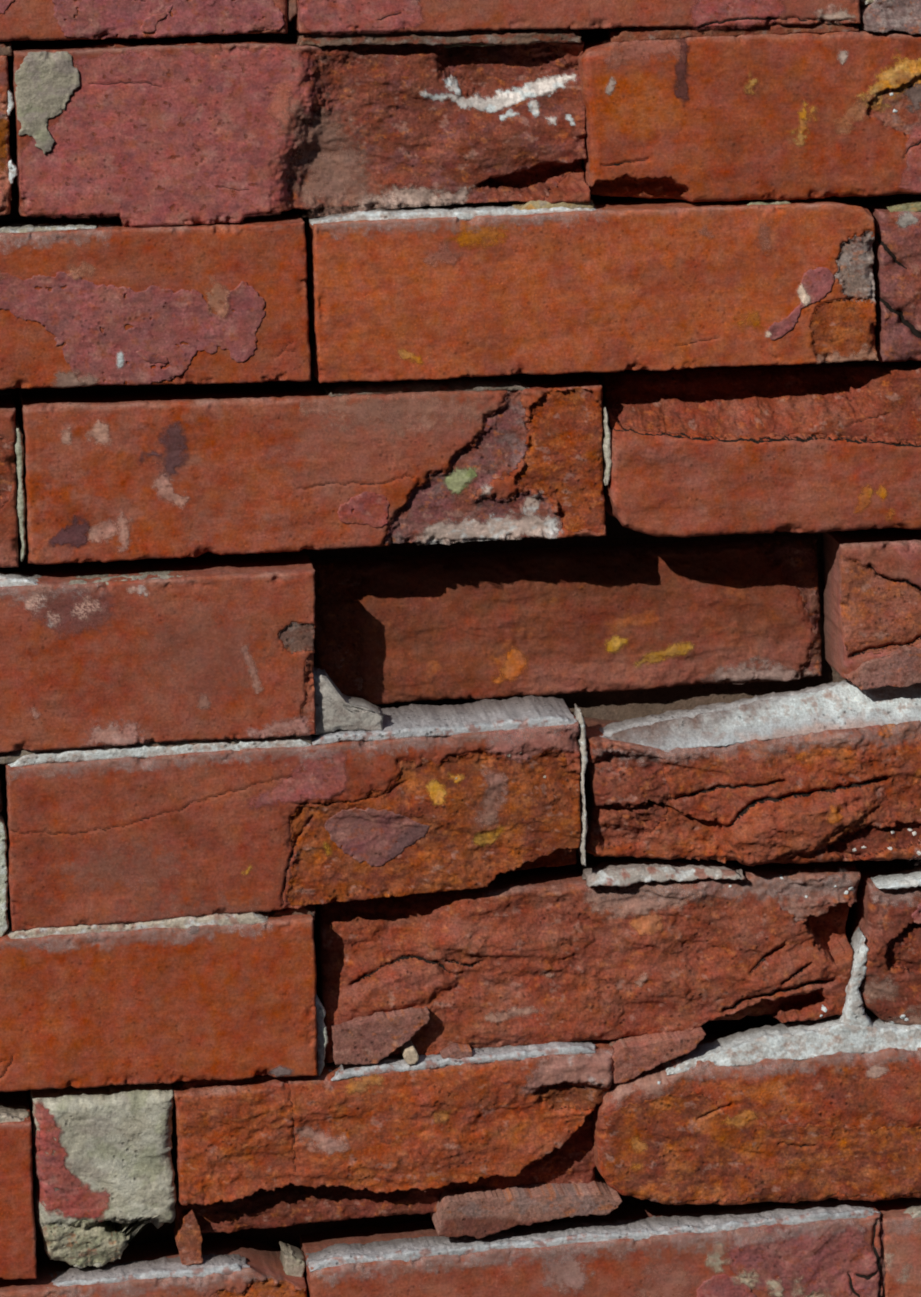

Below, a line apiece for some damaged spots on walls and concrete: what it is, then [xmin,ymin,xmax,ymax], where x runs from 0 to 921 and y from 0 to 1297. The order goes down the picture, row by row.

peeling [0,0,587,227]
spalling [589,178,687,200]
peeling [0,272,266,386]
spalling [337,230,921,545]
crack [869,565,921,591]
crack [850,636,921,657]
spalling [248,749,672,906]
peeling [34,1102,130,1268]
spalling [177,1082,921,1234]
spalling [211,1278,307,1297]
peeling [697,1220,881,1297]